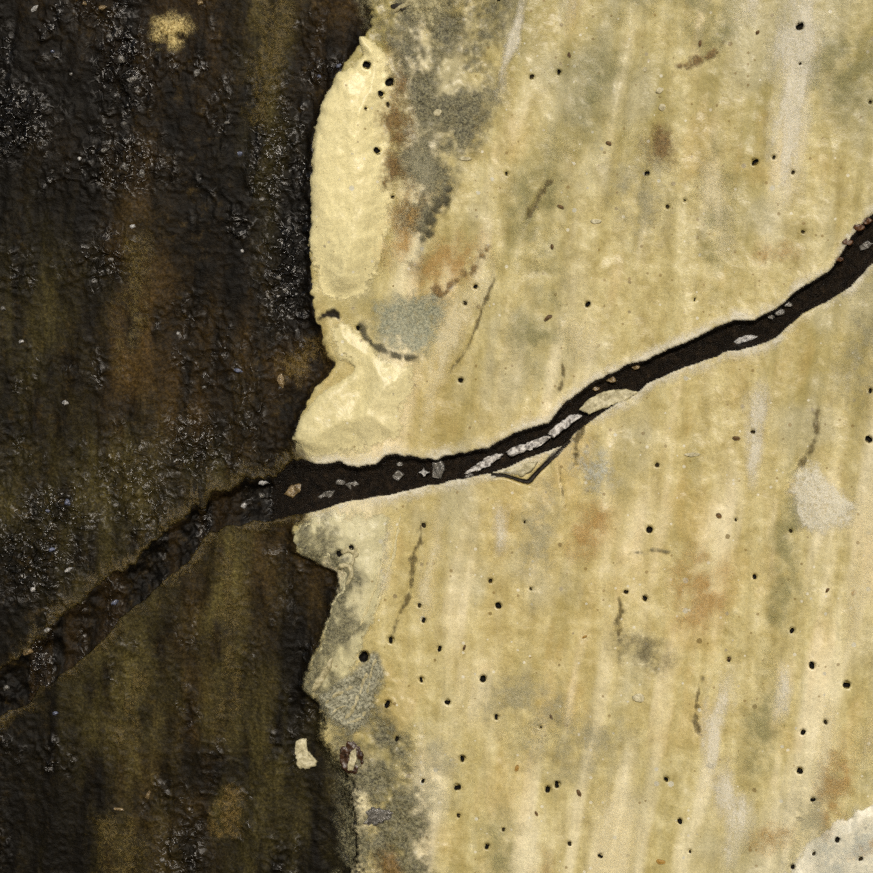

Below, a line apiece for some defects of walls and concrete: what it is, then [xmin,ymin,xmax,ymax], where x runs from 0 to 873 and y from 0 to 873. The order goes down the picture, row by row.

peeling [154,15,190,48]
efflorescence [503,14,522,65]
crack [527,180,553,217]
crack [0,214,873,732]
spalling [311,652,384,774]
spalling [295,738,317,770]
spalling [355,807,393,826]